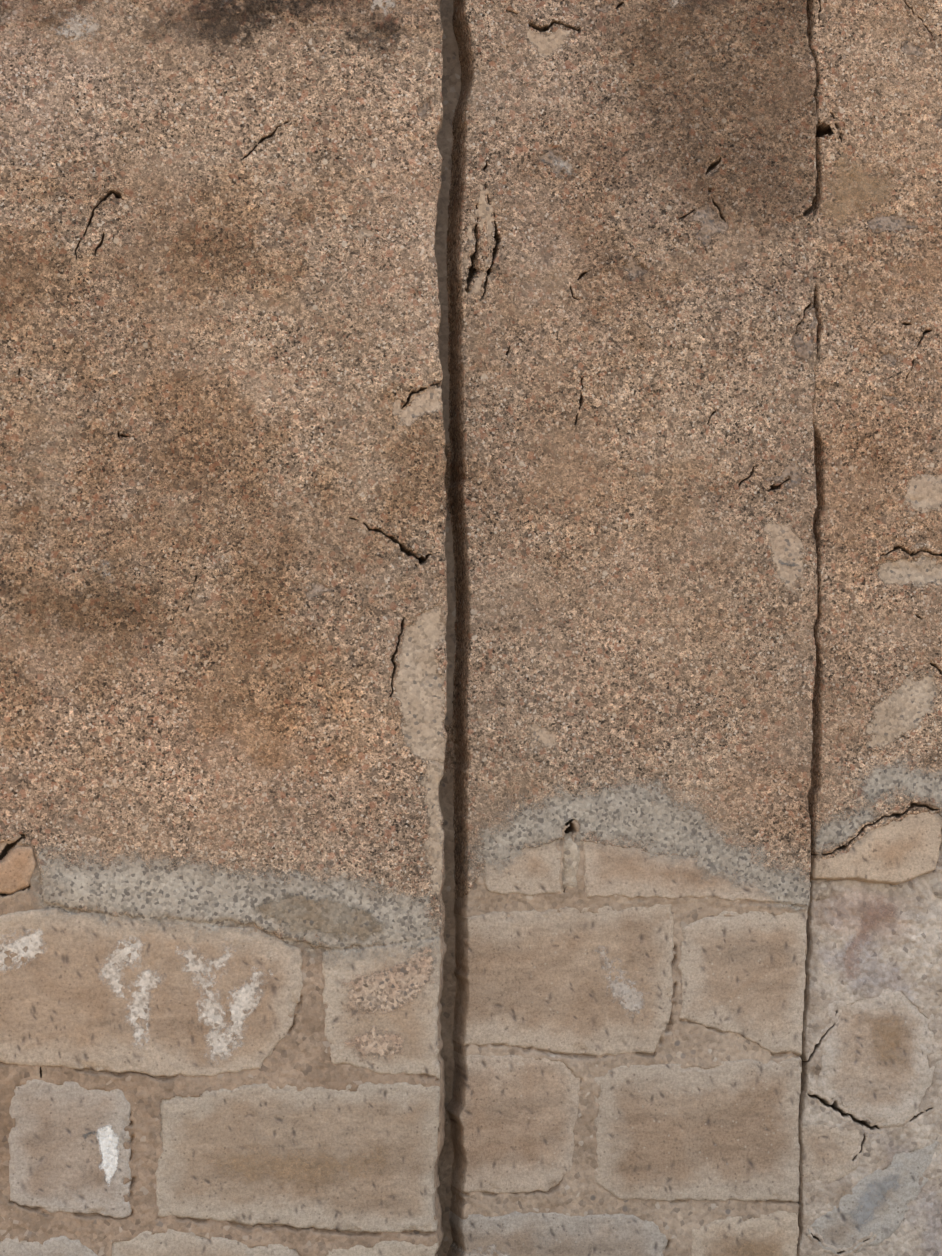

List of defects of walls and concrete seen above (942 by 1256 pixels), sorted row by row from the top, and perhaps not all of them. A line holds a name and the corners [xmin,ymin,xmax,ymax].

crack [69,186,125,266]
crack [463,150,506,298]
crack [346,514,432,569]
crack [879,541,942,561]
peeling [389,607,447,895]
water stain [479,780,810,910]
crack [811,799,942,859]
water stain [815,761,942,847]
water stain [0,930,43,971]
water stain [34,853,440,1061]
crack [802,1003,942,1162]
water stain [84,1126,119,1184]